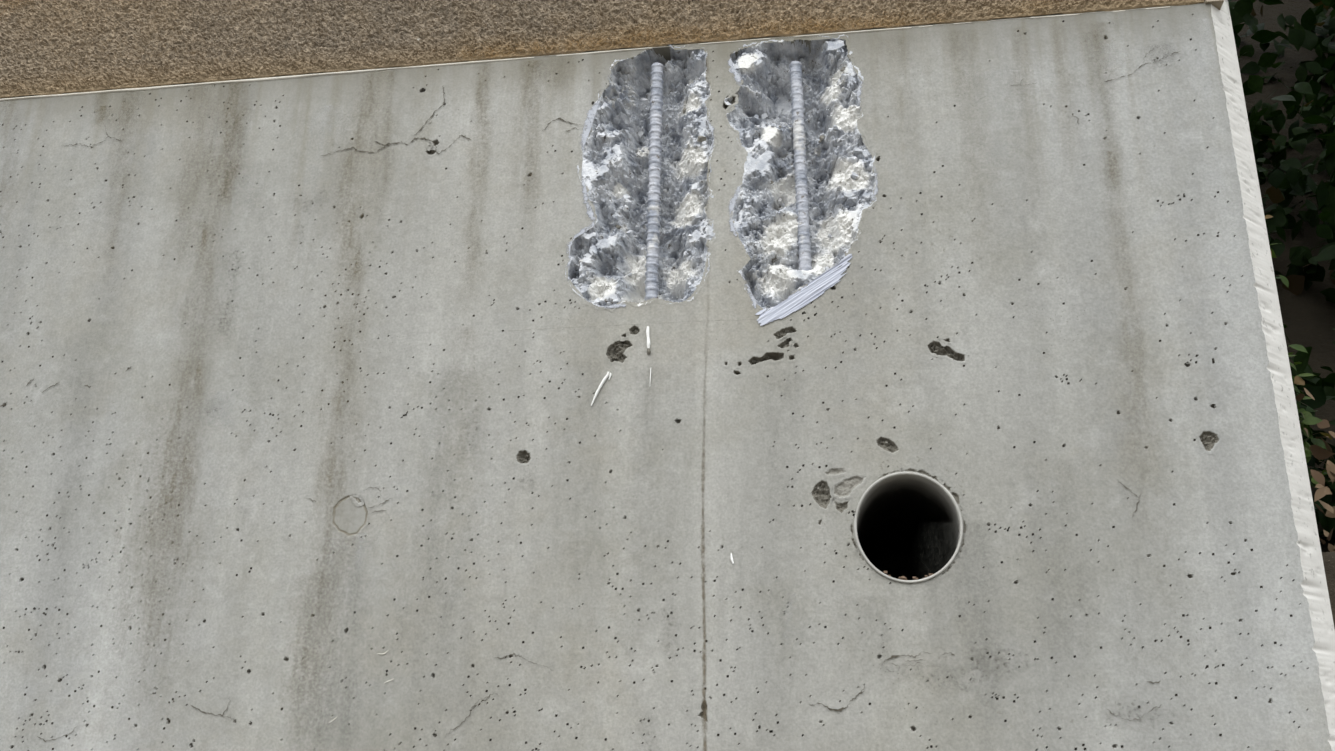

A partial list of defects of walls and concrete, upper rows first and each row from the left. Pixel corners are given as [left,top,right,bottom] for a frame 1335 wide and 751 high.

crack [321,89,471,156]
spalling [564,34,879,326]